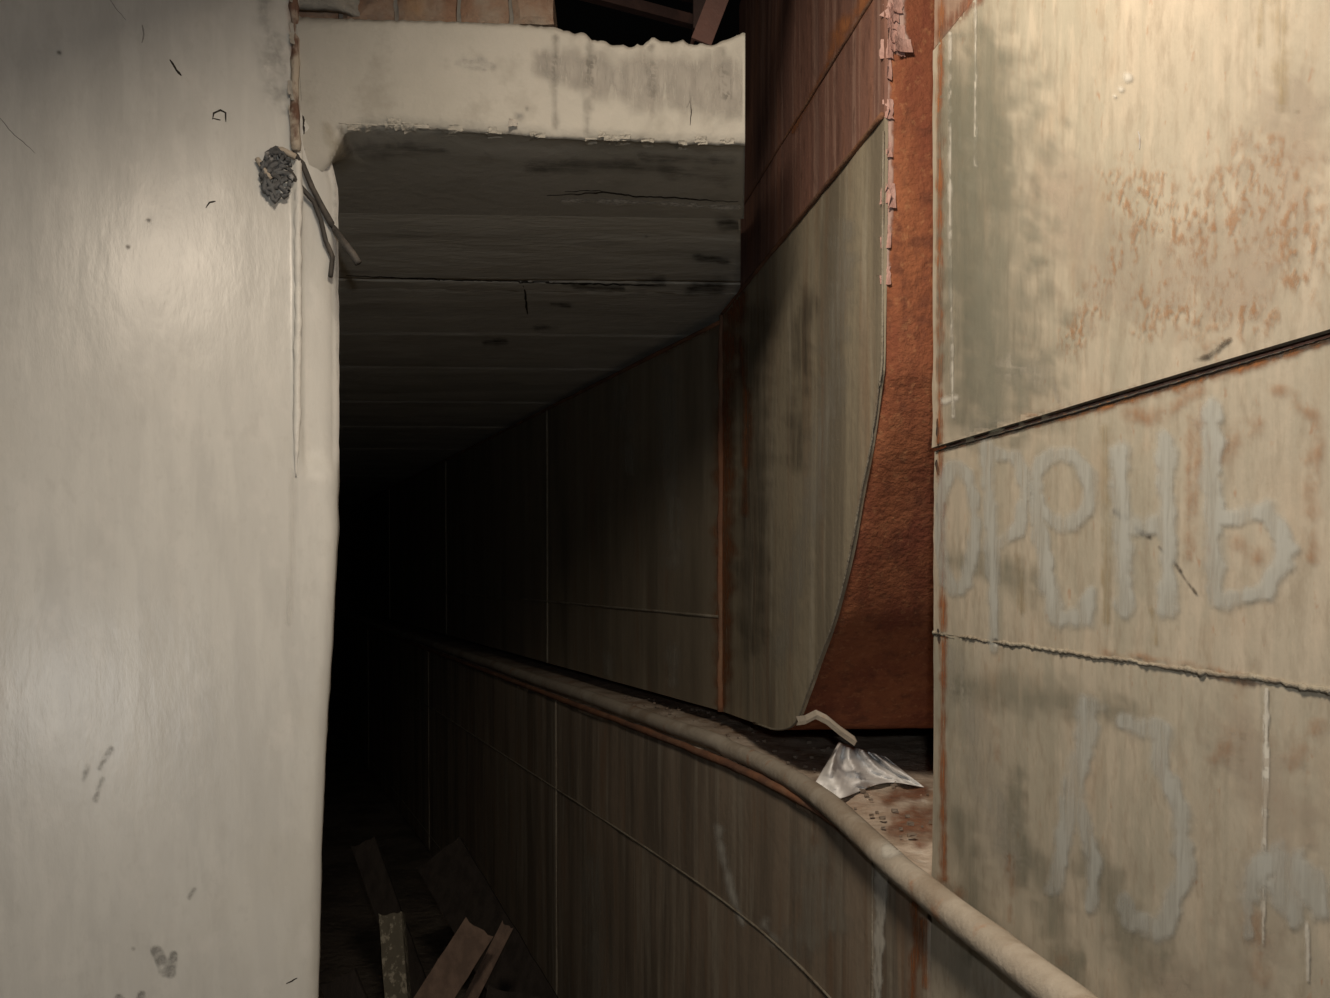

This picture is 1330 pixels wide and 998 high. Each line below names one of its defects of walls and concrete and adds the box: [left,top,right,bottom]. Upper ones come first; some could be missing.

rust [936,0,981,551]
rust [884,570,946,881]